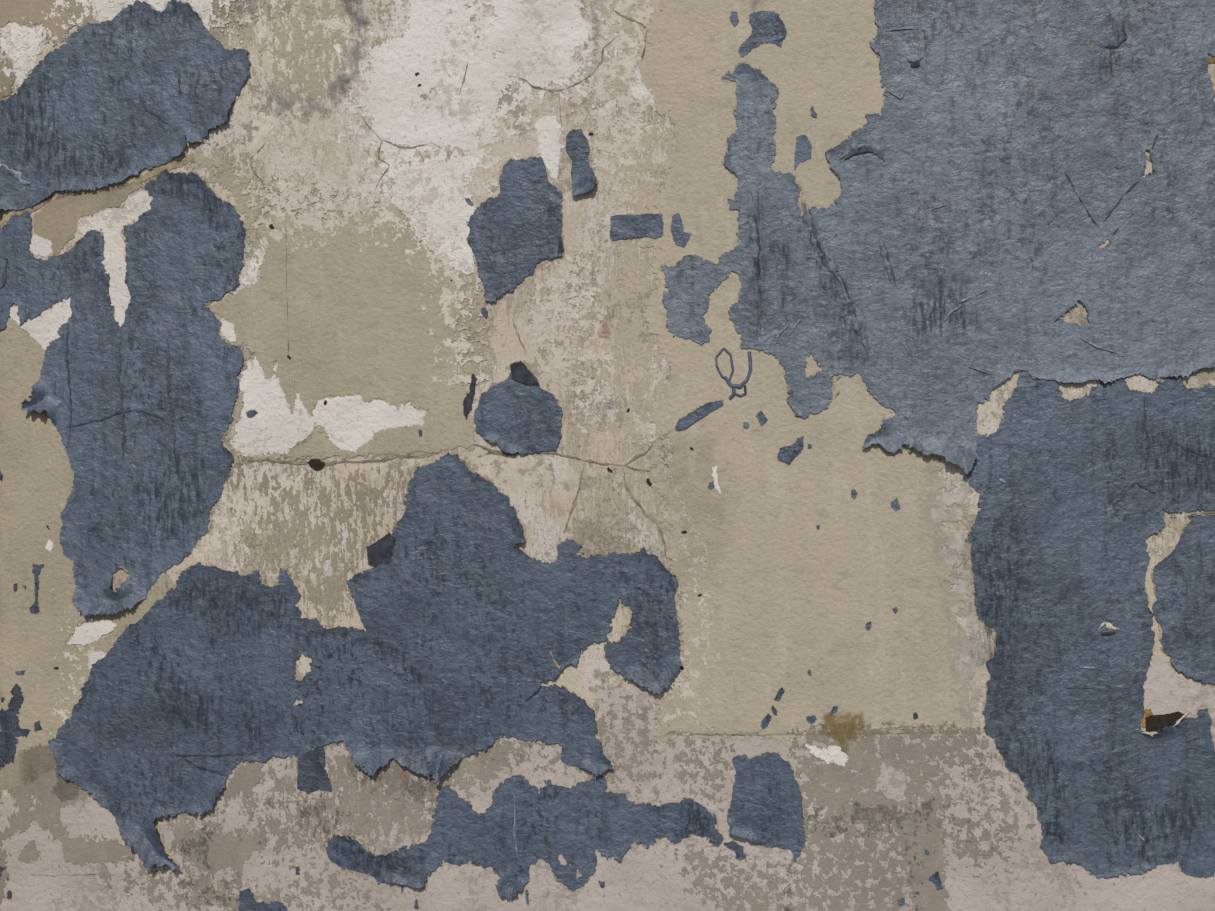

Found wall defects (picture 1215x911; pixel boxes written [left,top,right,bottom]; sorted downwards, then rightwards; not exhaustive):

flaking render [236,0,256,29]
crack [515,8,650,124]
crack [362,117,426,189]
flaking render [505,108,534,139]
peeling [343,460,395,560]
peeling [396,457,409,501]
crack [233,431,671,562]
peeling [322,548,355,618]